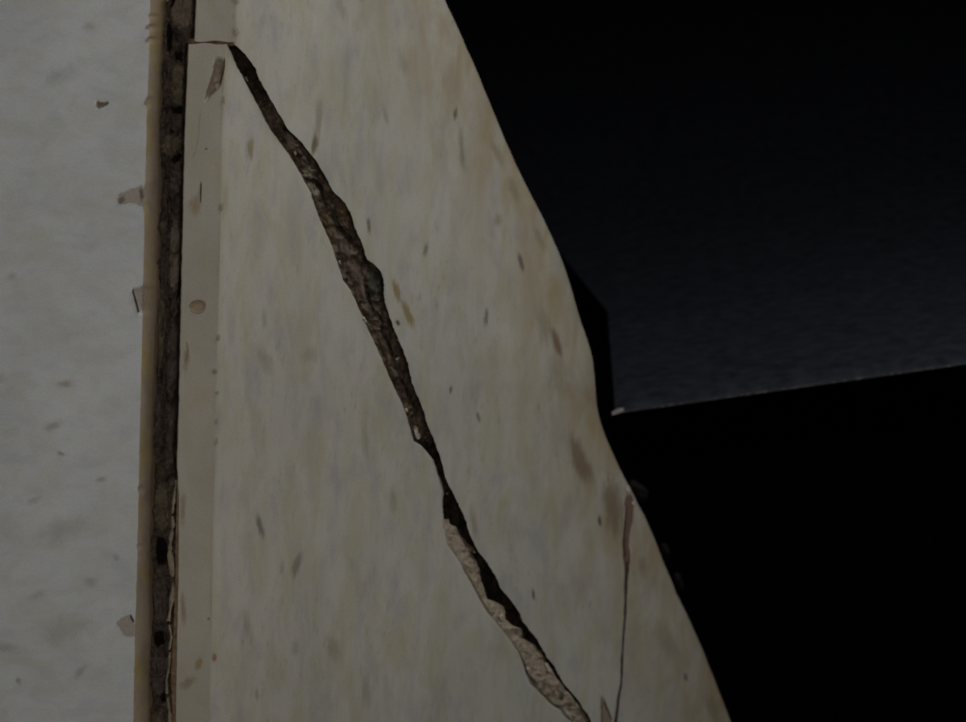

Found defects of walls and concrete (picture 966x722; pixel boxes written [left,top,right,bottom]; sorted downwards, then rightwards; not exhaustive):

crack [188,38,591,722]
crack [614,485,634,722]